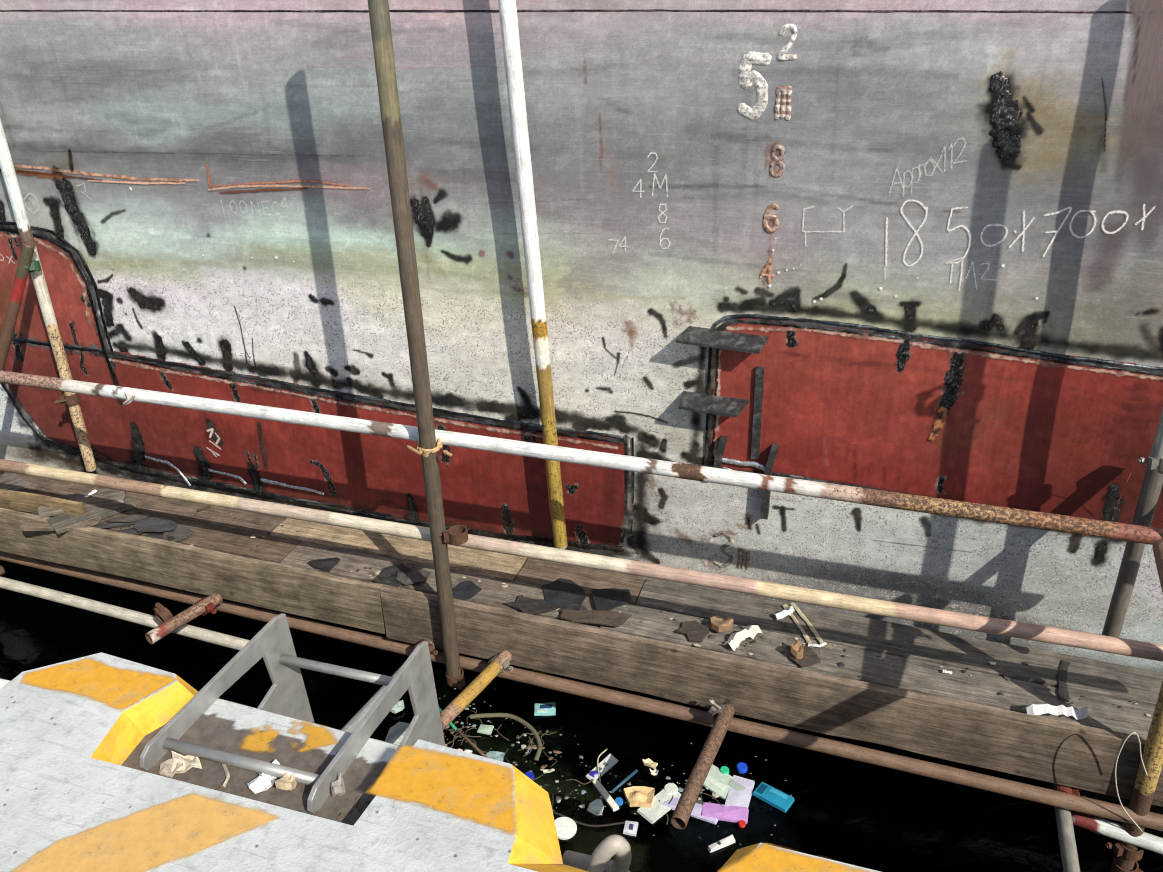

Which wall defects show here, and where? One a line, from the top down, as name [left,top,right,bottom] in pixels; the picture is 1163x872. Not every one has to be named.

leakage [1123,0,1163,152]
rust [928,406,948,441]